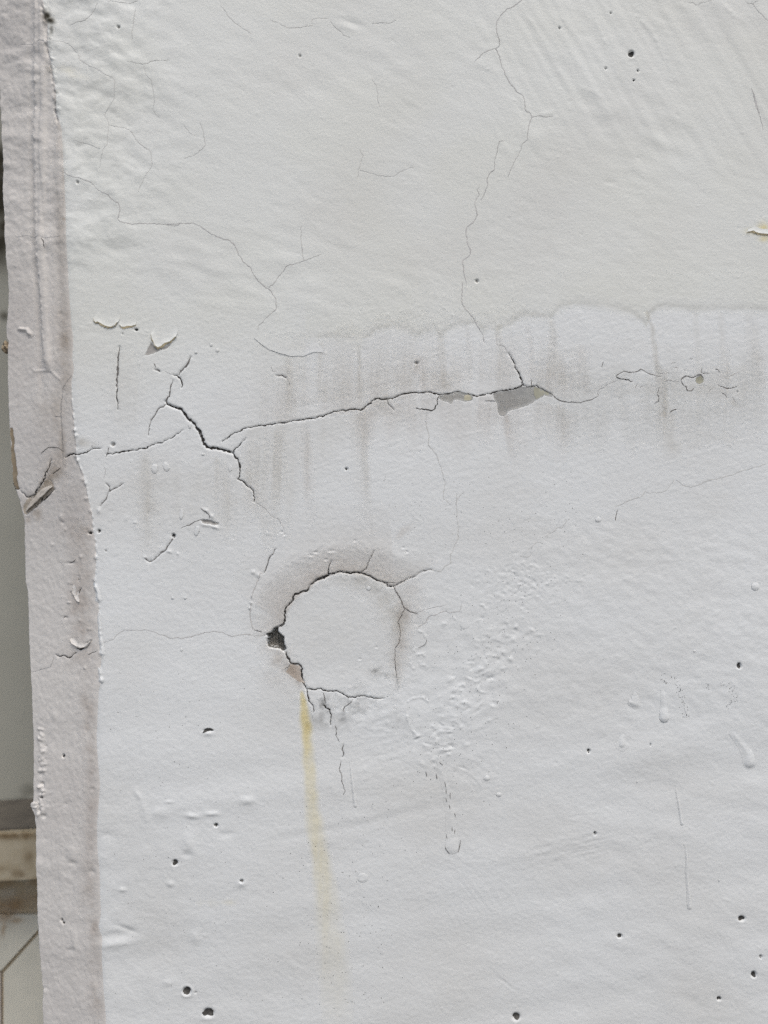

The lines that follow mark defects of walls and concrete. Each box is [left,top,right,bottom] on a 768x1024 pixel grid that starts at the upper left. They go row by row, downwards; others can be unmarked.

peeling [93,303,138,334]
peeling [144,313,178,355]
crack [13,0,741,677]
spalling [439,392,473,403]
spalling [493,387,552,416]
spalling [23,479,54,514]
crack [615,464,764,520]
spalling [267,627,286,651]
crack [286,653,382,795]